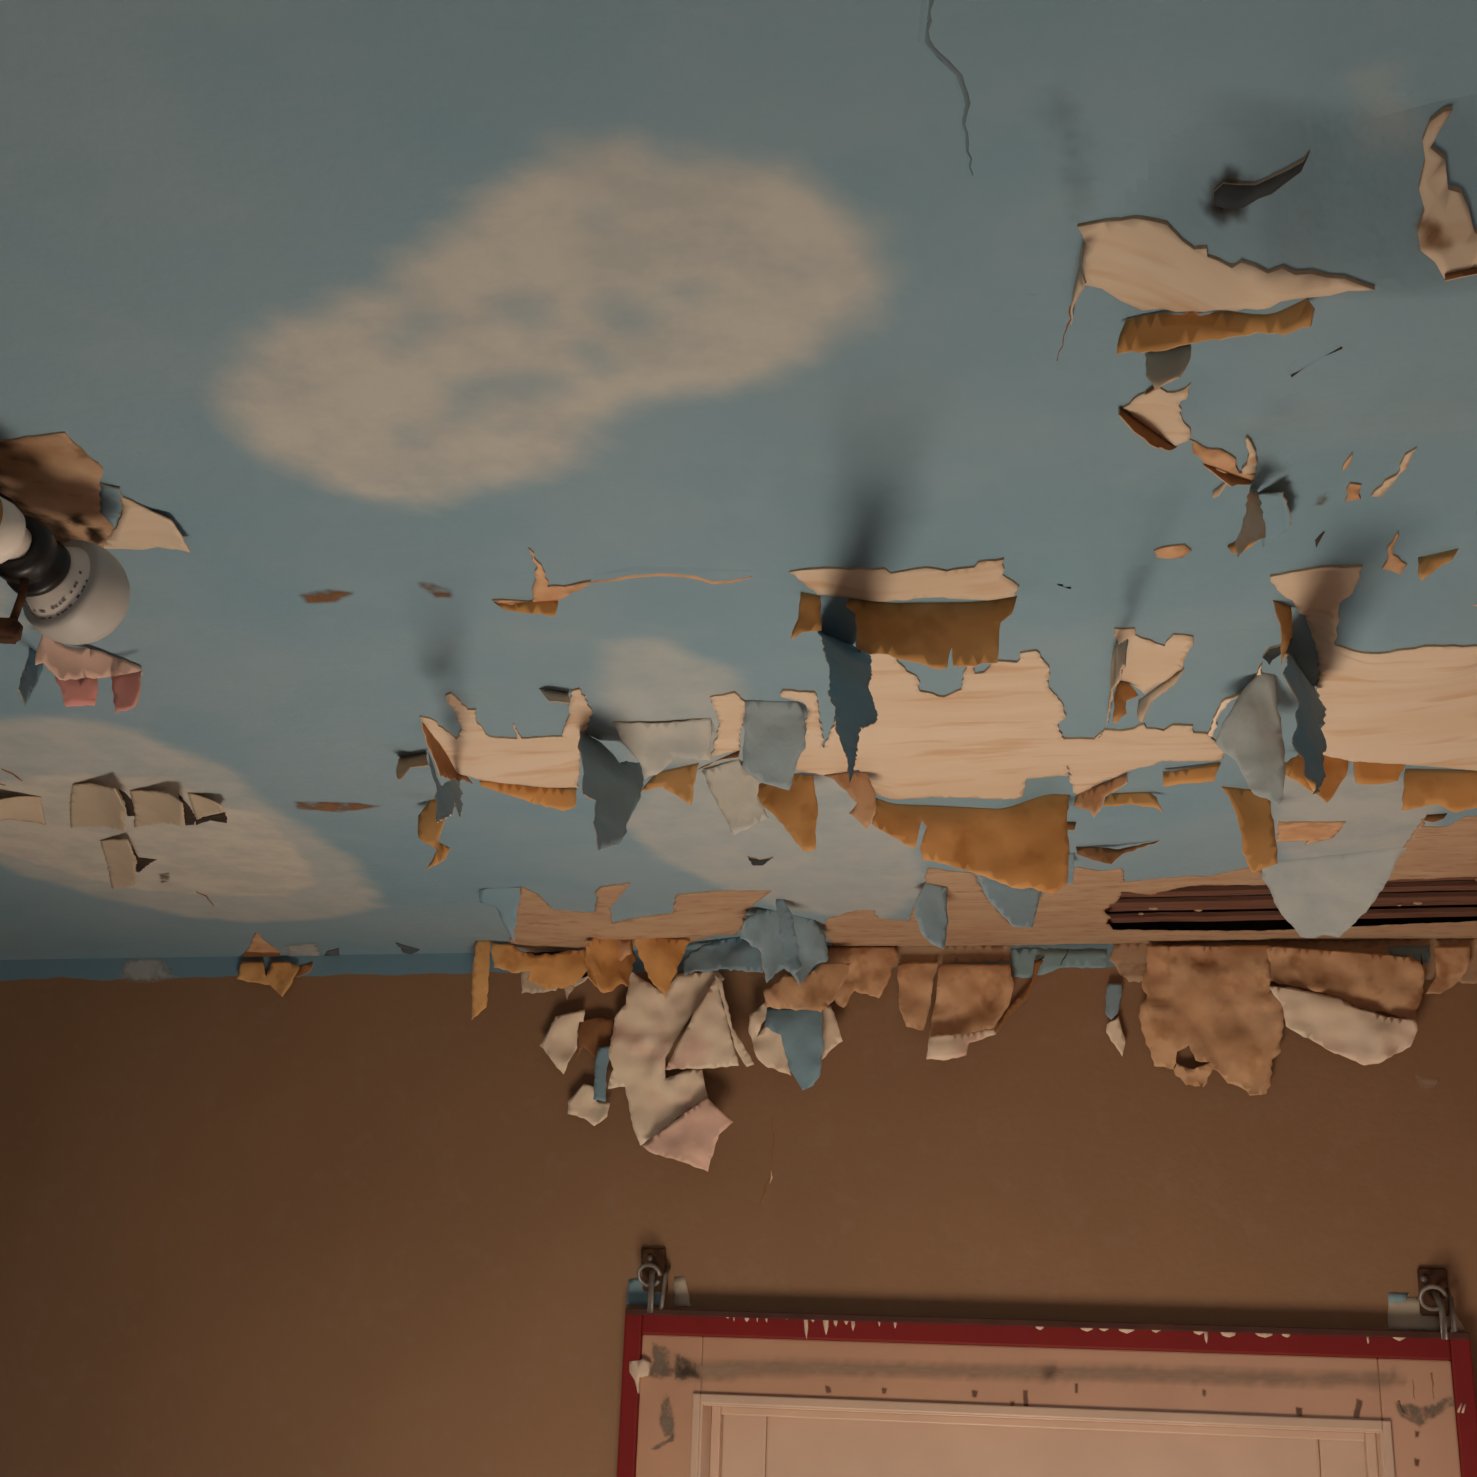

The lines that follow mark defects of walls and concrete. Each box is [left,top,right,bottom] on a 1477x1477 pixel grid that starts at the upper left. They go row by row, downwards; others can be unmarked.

crack [917,0,973,176]
peeling [1417,106,1477,281]
peeling [1057,215,1375,559]
flaking render [0,432,116,550]
peeling [1342,446,1417,501]
peeling [1382,531,1459,580]
peeling [18,635,143,713]
peeling [0,796,46,825]
peeling [70,783,227,889]
peeling [396,547,1477,1095]
peeling [236,932,340,997]